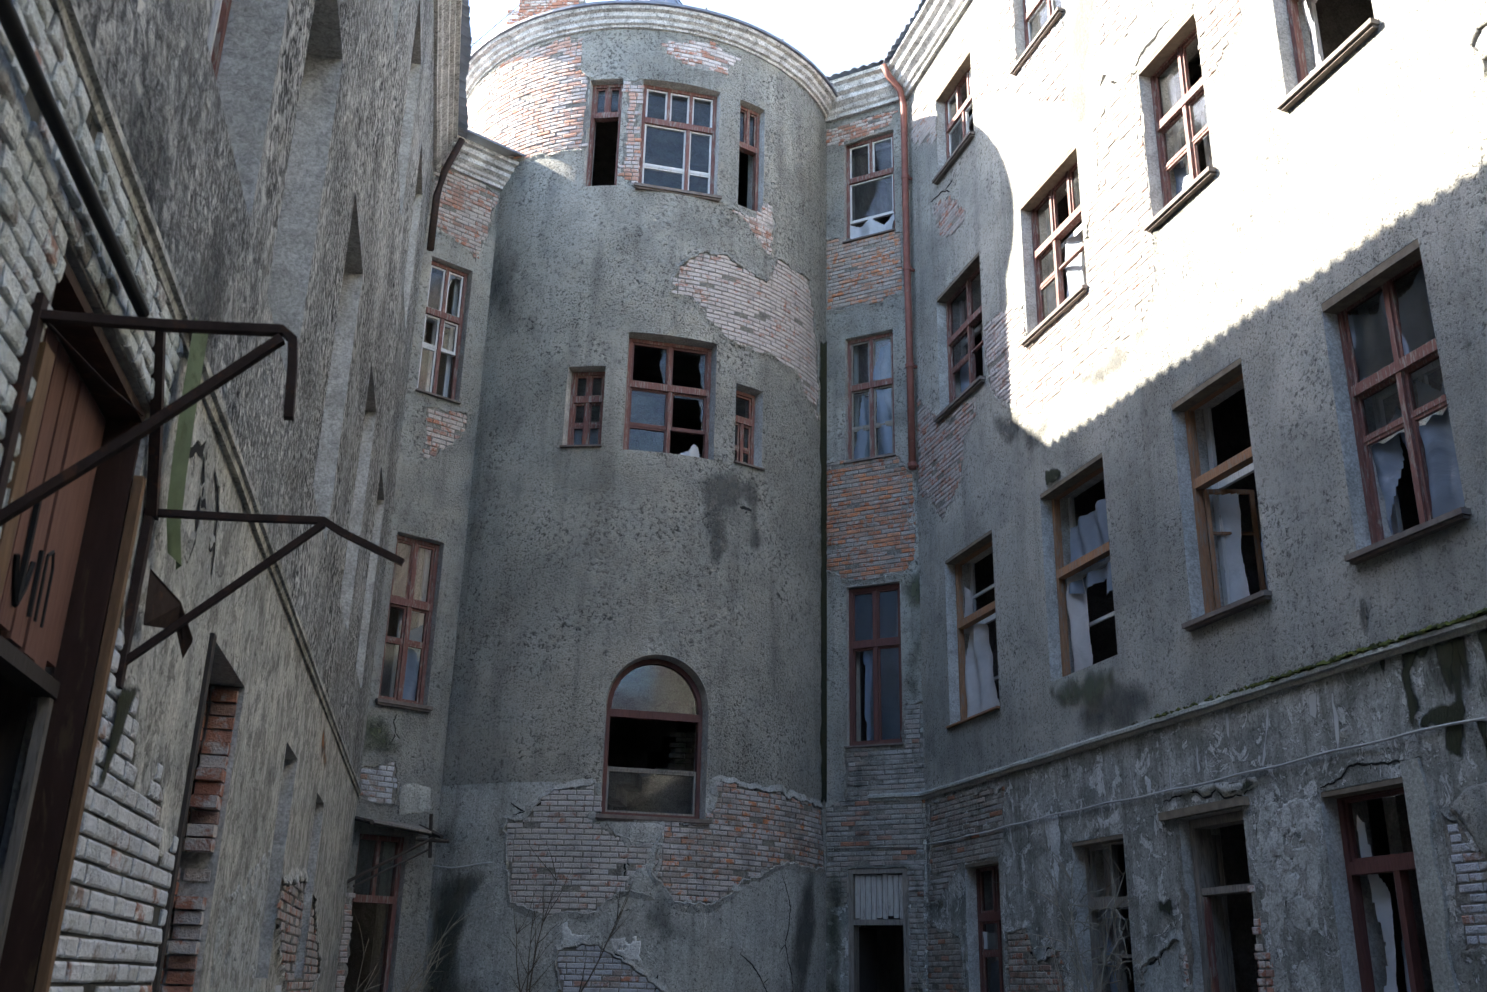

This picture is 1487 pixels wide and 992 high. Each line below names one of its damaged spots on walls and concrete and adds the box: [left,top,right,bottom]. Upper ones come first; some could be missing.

spalling [467,35,595,162]
spalling [617,77,644,191]
spalling [654,36,746,79]
spalling [826,0,1071,152]
spalling [1188,0,1250,90]
peeling [1464,15,1487,81]
spalling [667,197,904,427]
spalling [826,66,1162,585]
water stain [704,475,759,558]
water stain [1083,687,1147,728]
spalling [499,695,1009,992]
peeling [1247,798,1322,992]